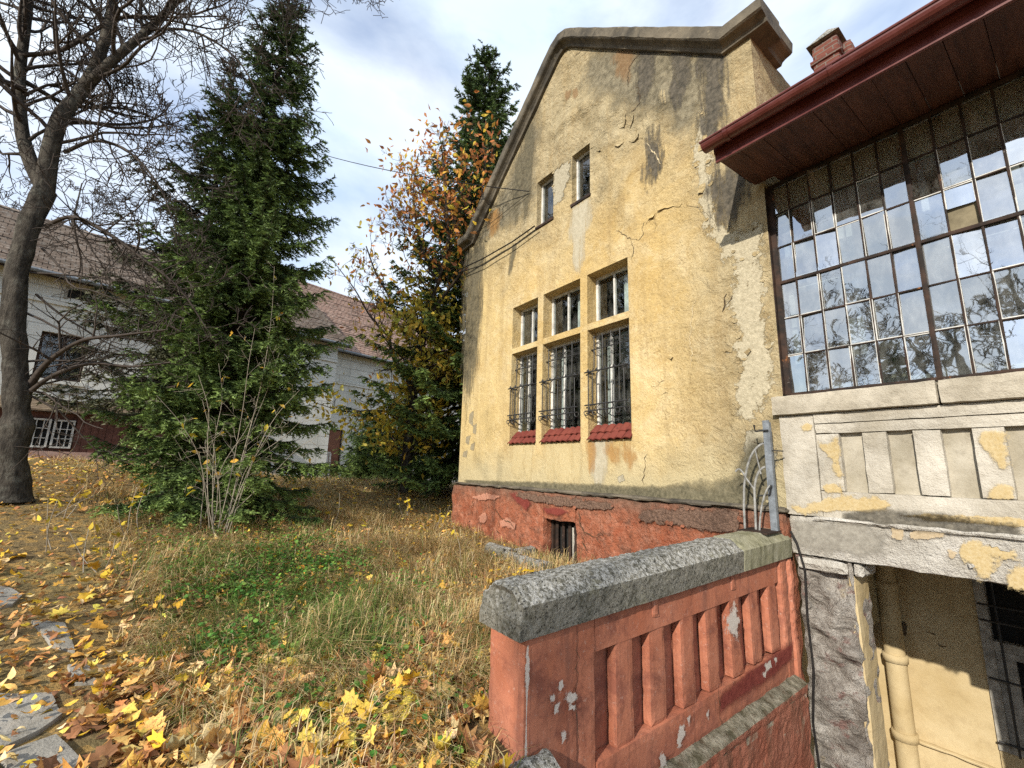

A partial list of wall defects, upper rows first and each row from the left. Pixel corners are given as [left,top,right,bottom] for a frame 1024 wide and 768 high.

leakage [635,52,656,101]
leakage [669,53,729,137]
leakage [641,125,665,182]
leakage [704,163,751,230]
peeling [587,50,778,479]
leakage [465,440,768,510]
peeling [791,437,890,516]
peeling [979,431,1010,469]
spalling [638,505,743,534]
peeling [947,540,1024,590]
peeling [724,601,740,638]
peeling [550,679,578,714]